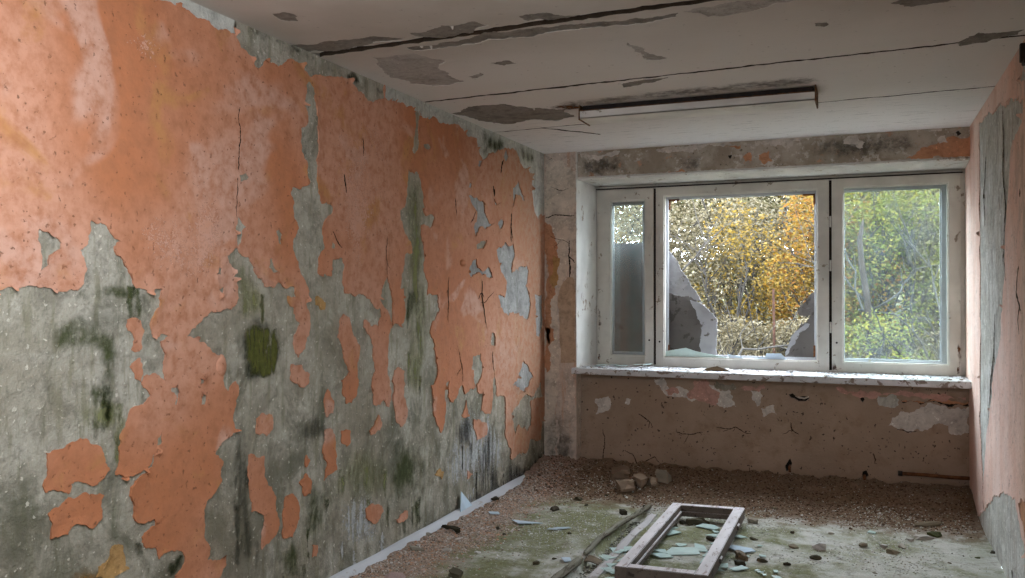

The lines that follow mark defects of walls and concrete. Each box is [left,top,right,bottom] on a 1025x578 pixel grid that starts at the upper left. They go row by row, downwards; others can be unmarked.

peeling [957,30,1022,46]
damp [109,286,140,316]
damp [243,289,268,377]
peeling [162,0,793,578]
peeling [577,97,1023,476]
damp [58,323,123,463]
peeling [0,221,185,578]
damp [393,451,415,493]
damp [443,411,523,503]
damp [169,555,182,575]
damp [285,495,329,575]
peeling [979,490,1025,578]